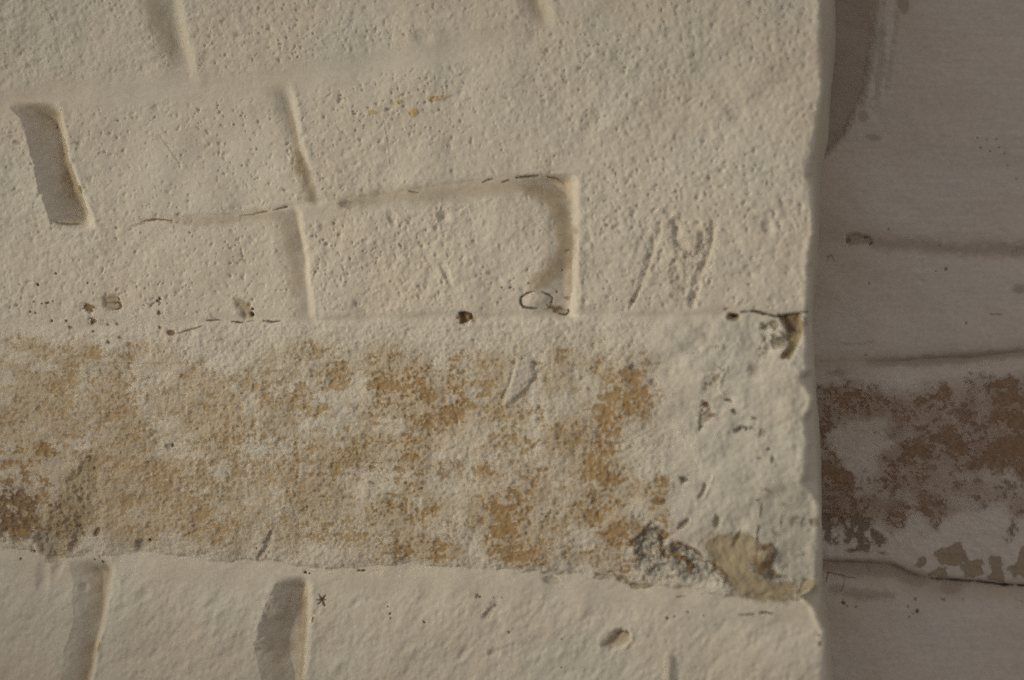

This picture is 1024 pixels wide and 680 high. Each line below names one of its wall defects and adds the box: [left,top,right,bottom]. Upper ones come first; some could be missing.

spalling [759,314,803,358]
peeling [0,304,688,588]
spalling [704,517,817,602]
peeling [811,374,1024,584]